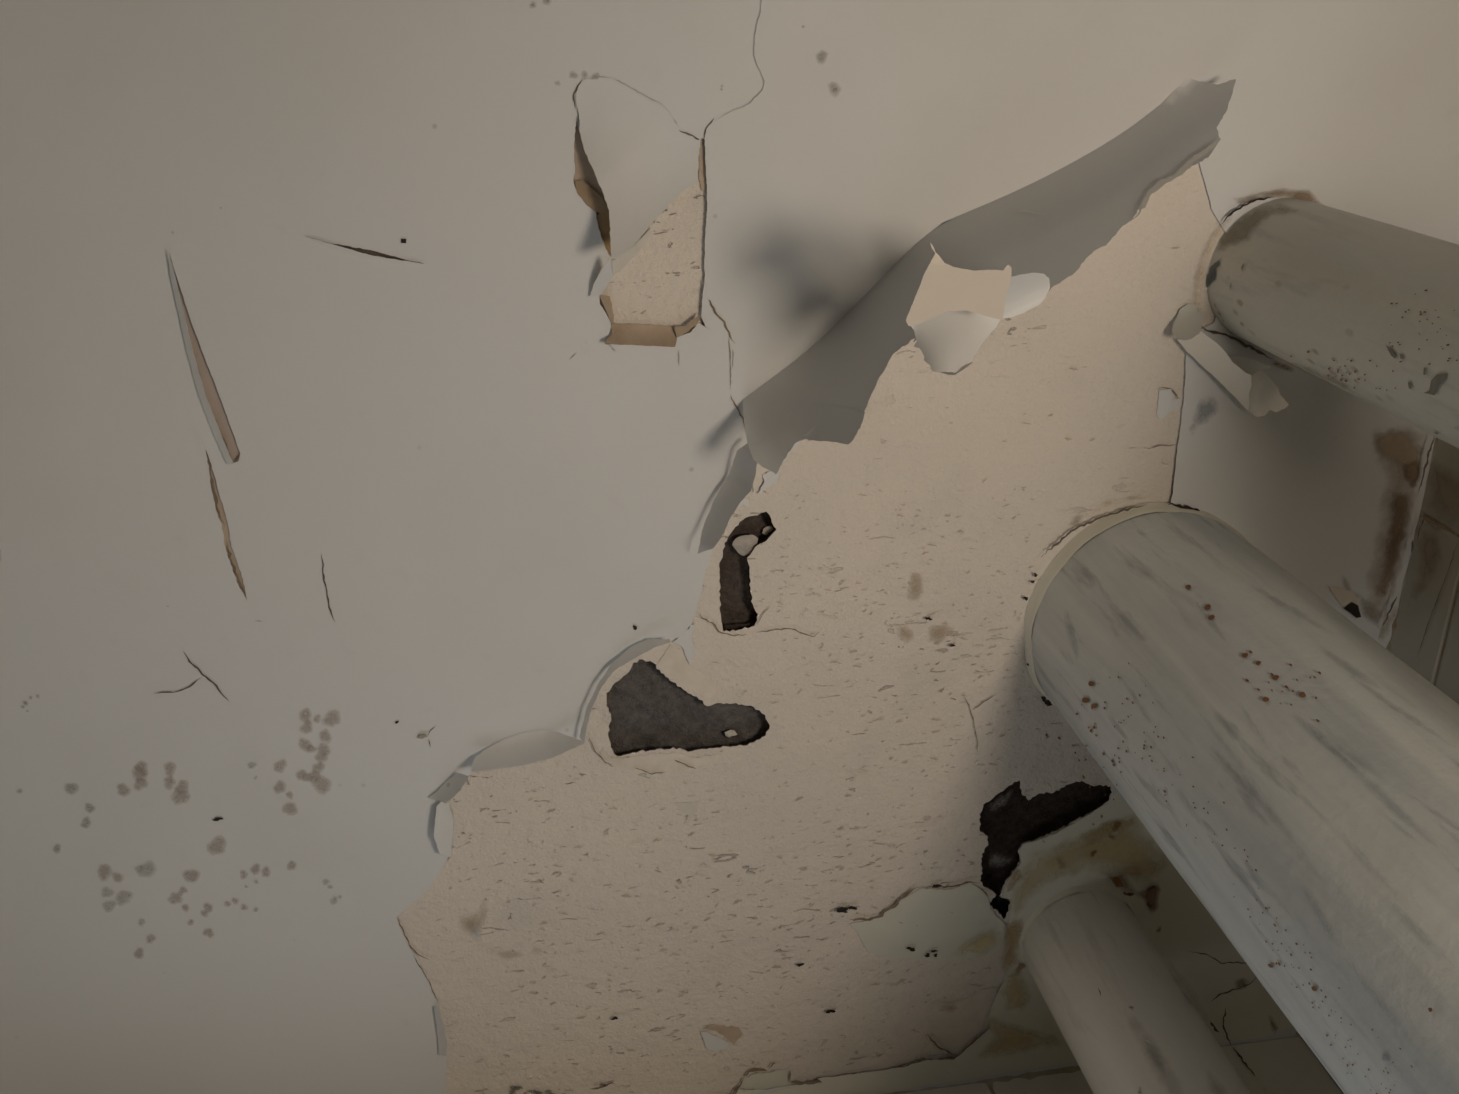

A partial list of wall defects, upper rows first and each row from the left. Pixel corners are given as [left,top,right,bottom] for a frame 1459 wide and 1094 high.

peeling [396,77,1289,1094]